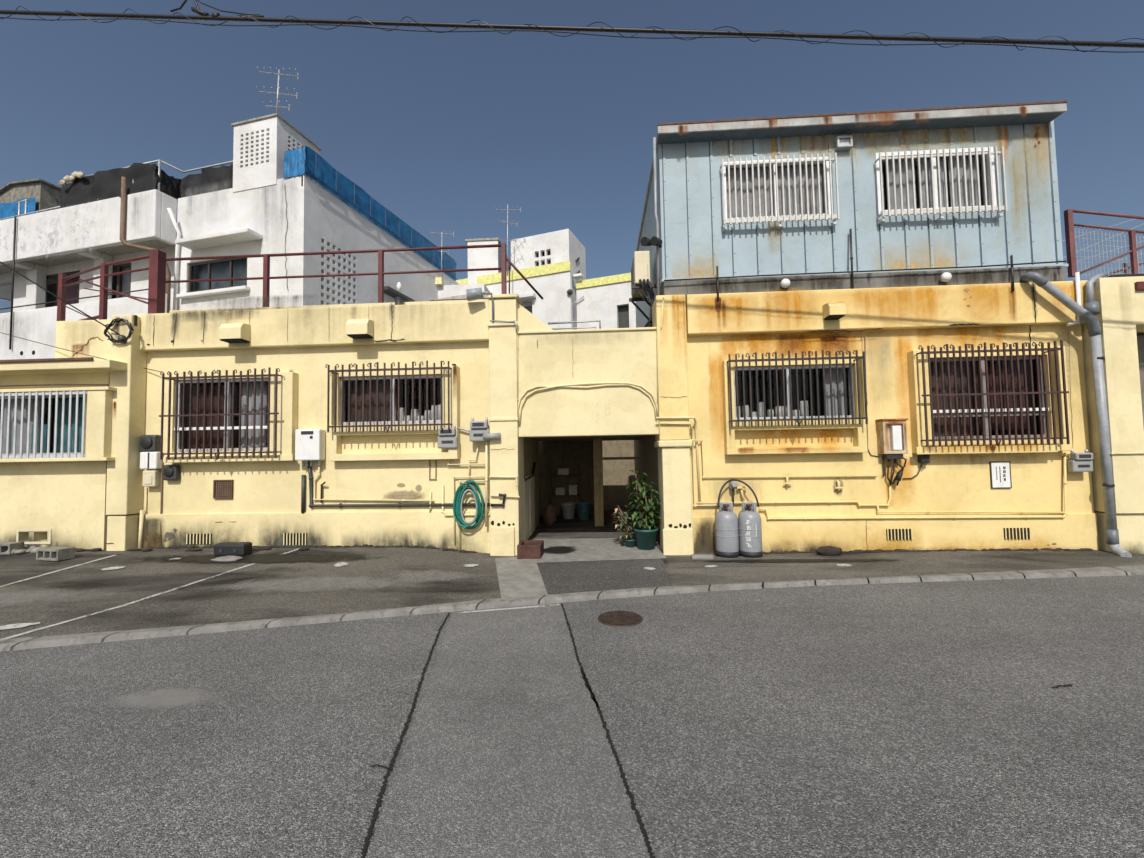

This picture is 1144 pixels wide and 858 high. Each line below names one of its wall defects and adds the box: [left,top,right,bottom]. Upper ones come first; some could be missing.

rust [704,297,740,316]
rust [957,327,978,340]
water stain [137,519,238,548]
water stain [262,531,326,547]
water stain [882,540,912,550]